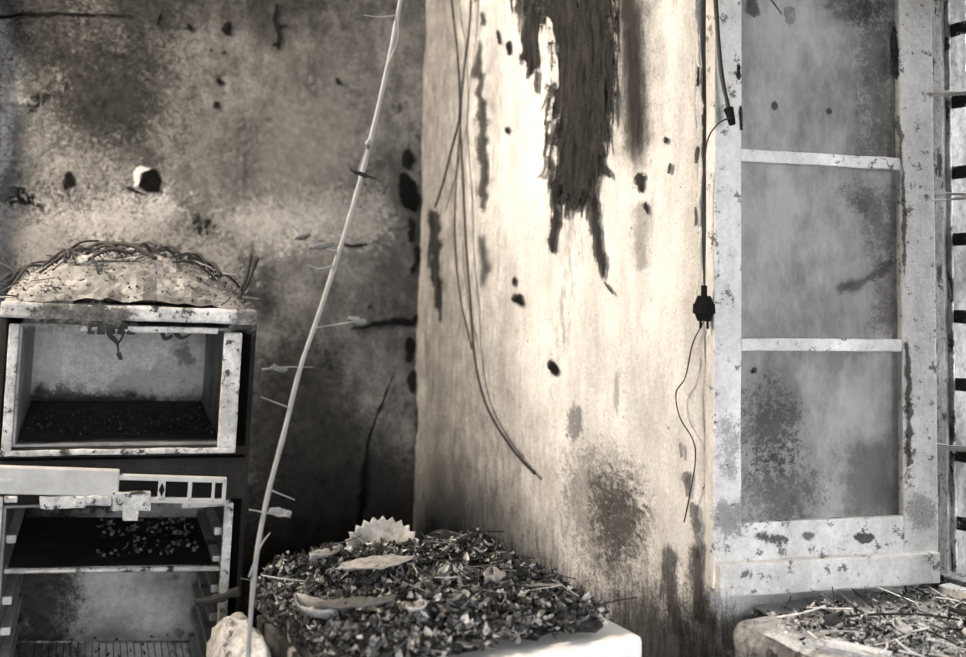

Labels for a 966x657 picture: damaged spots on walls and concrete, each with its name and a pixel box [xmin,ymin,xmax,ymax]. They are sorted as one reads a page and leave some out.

crack [0,11,132,19]
spalling [127,166,162,196]
damp [0,0,443,321]
peeling [691,0,704,296]
damp [404,337,417,394]
crack [357,377,394,526]
peeling [682,471,704,561]